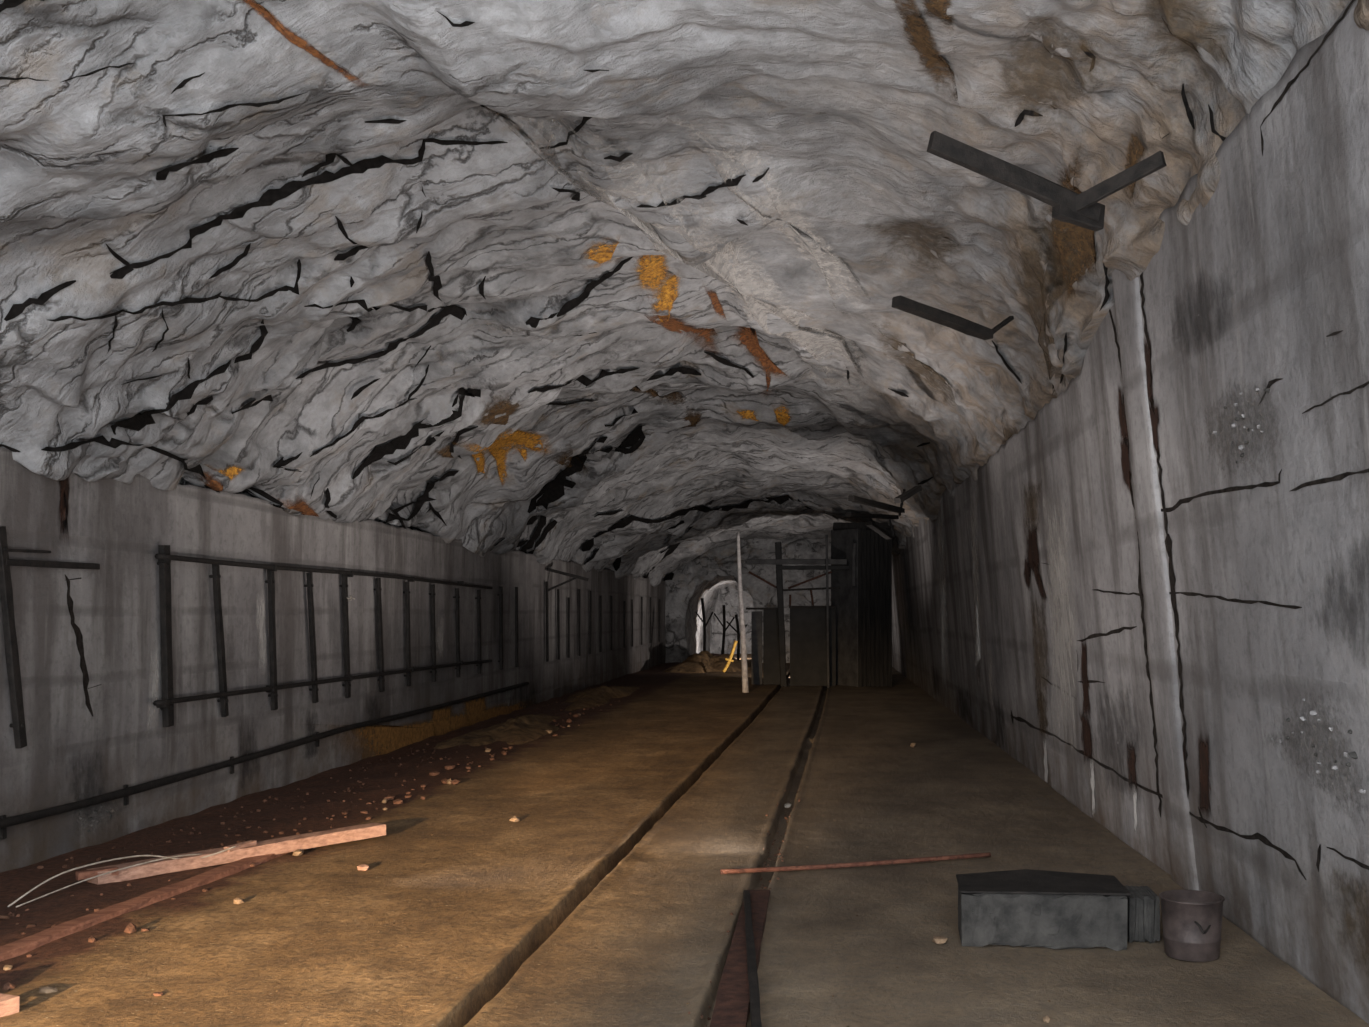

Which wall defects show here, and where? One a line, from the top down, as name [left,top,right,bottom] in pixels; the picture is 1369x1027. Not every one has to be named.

corrosion [243,0,360,82]
corrosion [587,243,619,265]
corrosion [637,255,787,394]
crack [1109,272,1154,408]
crack [1258,378,1283,406]
crack [1302,381,1369,414]
corrosion [774,407,790,428]
corrosion [437,431,585,484]
corrosion [202,466,243,493]
corrosion [283,501,319,517]
crack [1010,439,1369,880]